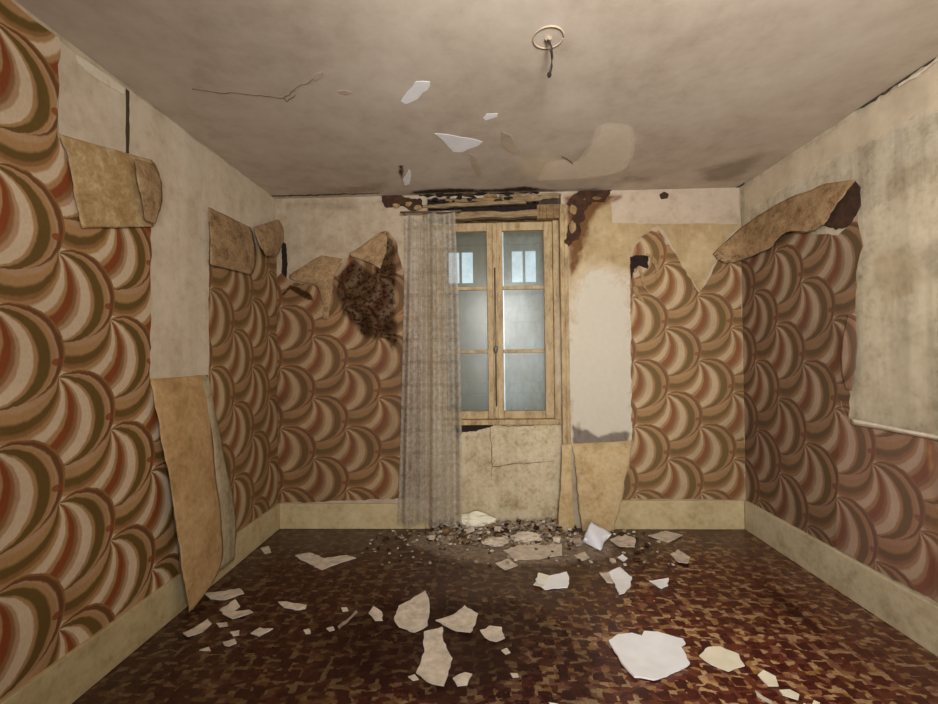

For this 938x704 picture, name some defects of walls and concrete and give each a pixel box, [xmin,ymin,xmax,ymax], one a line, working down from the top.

water stain [567,196,616,270]
peeling [58,41,430,621]
peeling [558,187,740,595]
peeling [183,619,212,637]
peeling [251,627,273,637]